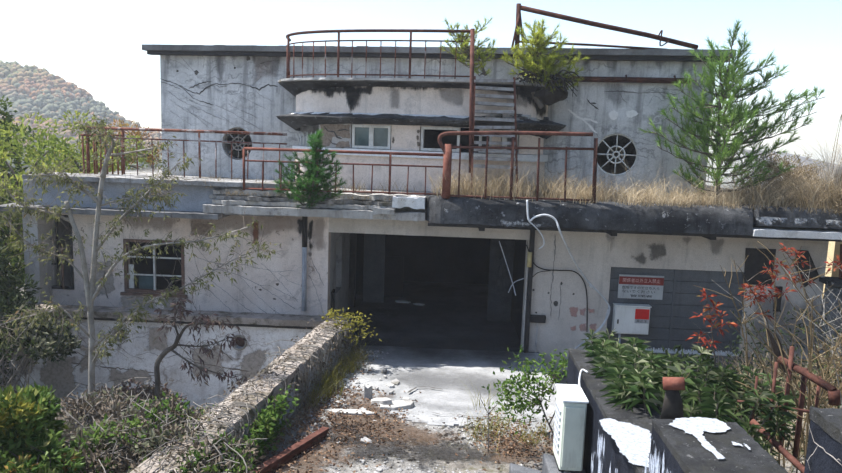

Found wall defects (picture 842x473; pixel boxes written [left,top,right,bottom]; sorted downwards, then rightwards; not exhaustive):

crack [160,55,280,131]
water stain [346,87,361,110]
peeling [15,344,98,399]
peeling [109,368,151,386]
peeling [241,349,269,383]
peeling [591,418,671,473]
peeling [669,417,731,459]